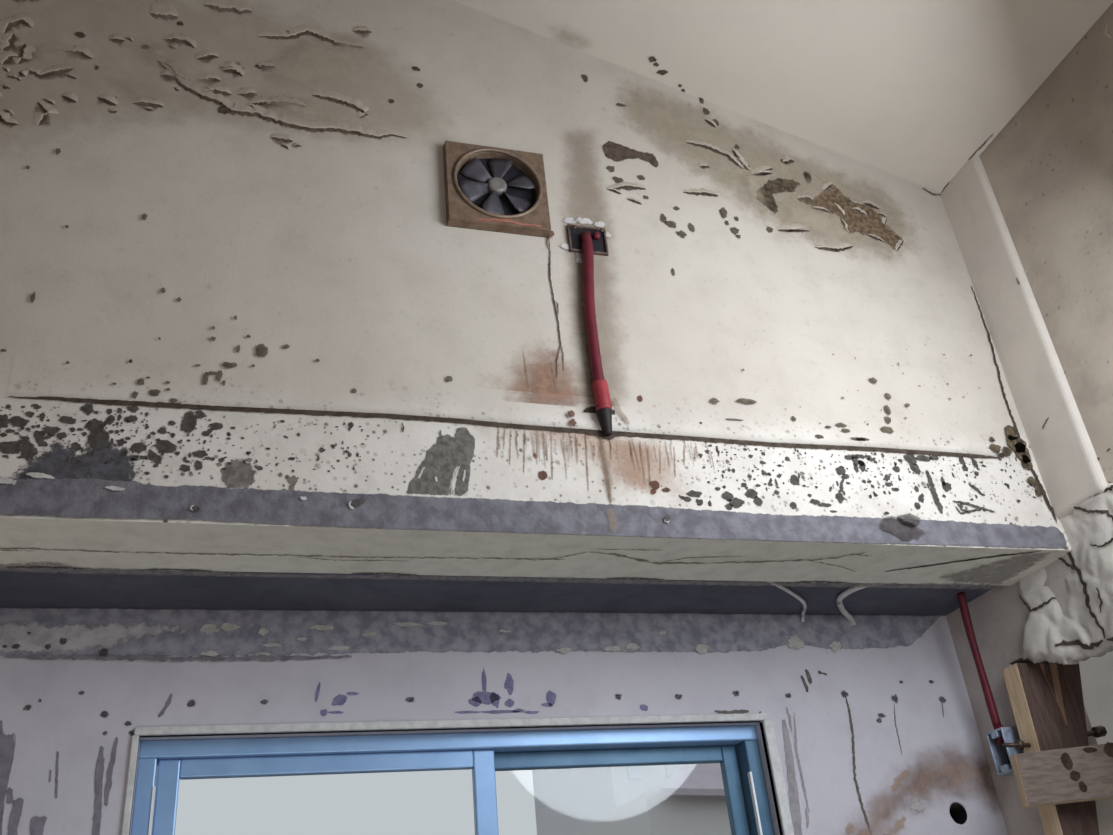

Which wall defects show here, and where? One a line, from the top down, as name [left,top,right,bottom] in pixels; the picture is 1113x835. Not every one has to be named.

peeling [0,0,99,127]
peeling [97,94,118,113]
peeling [109,0,407,149]
spalling [603,141,658,205]
peeling [616,95,904,252]
leakage [195,335,268,386]
leakage [0,376,317,482]
leakage [313,422,364,472]
crack [0,237,1113,650]
rust [497,352,715,502]
leakage [665,393,1043,514]
leakage [0,721,47,835]